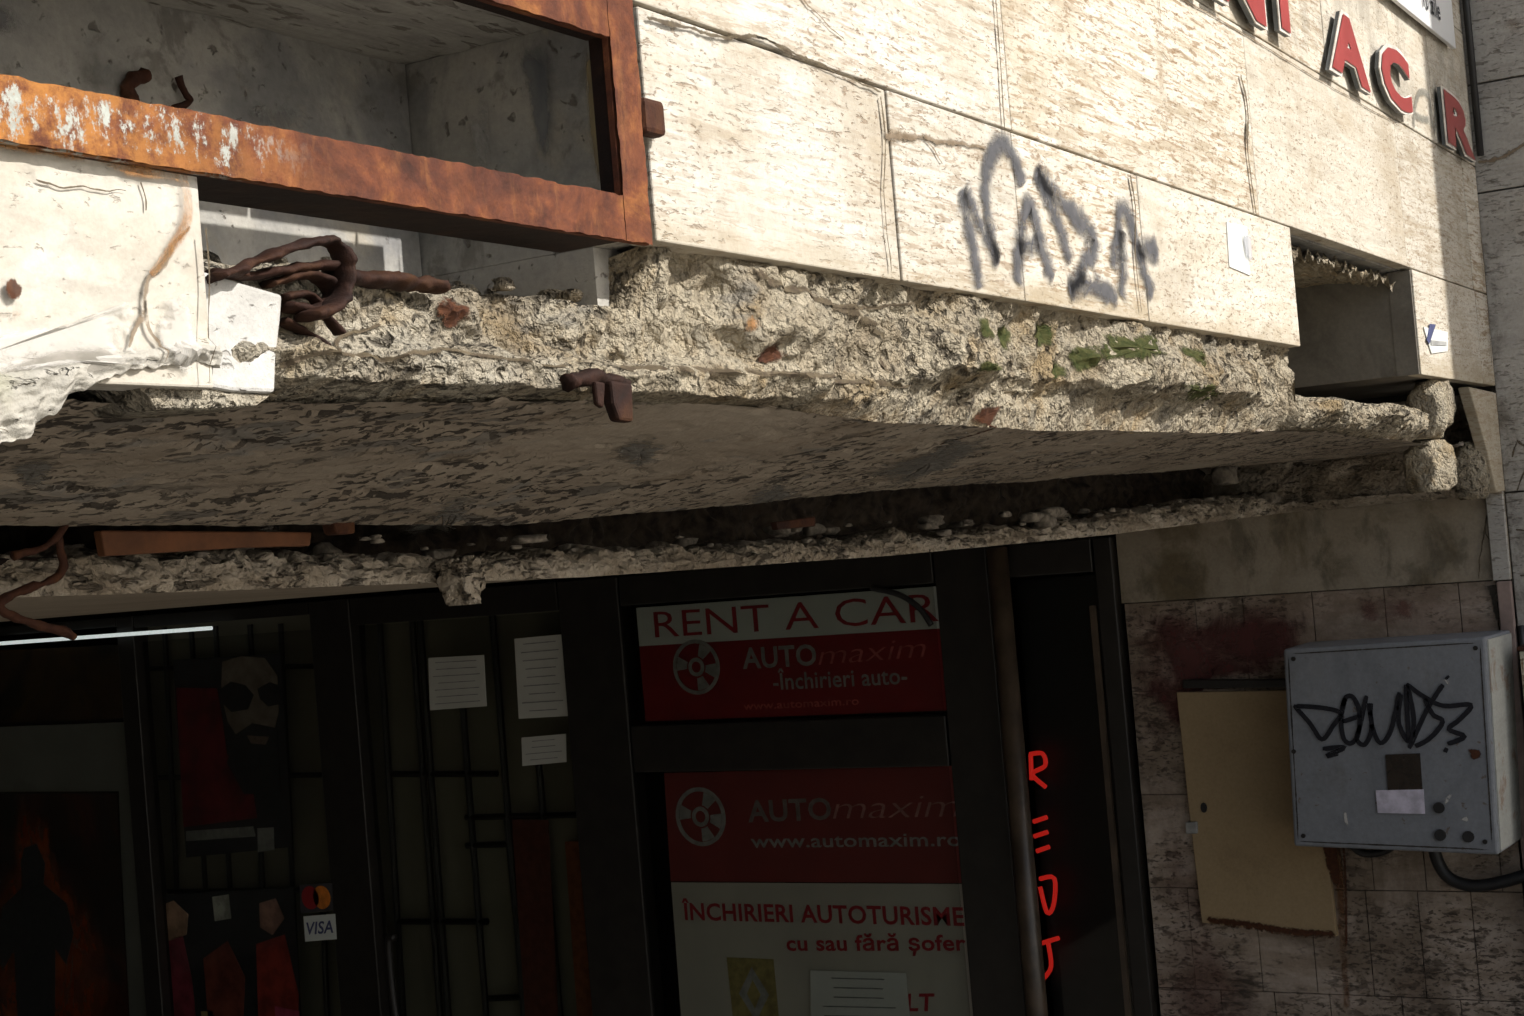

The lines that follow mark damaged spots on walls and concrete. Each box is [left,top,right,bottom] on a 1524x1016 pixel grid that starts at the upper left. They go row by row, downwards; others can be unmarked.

corrosion [0,143,82,160]
crack [36,179,147,210]
corrosion [114,164,160,177]
crack [1478,143,1524,163]
corrosion [150,198,192,275]
peeling [0,304,144,370]
crack [129,226,216,380]
peeling [160,299,202,369]
corrosion [355,269,470,328]
spalling [203,235,1430,486]
spalling [0,491,1288,598]
crack [1478,516,1524,620]